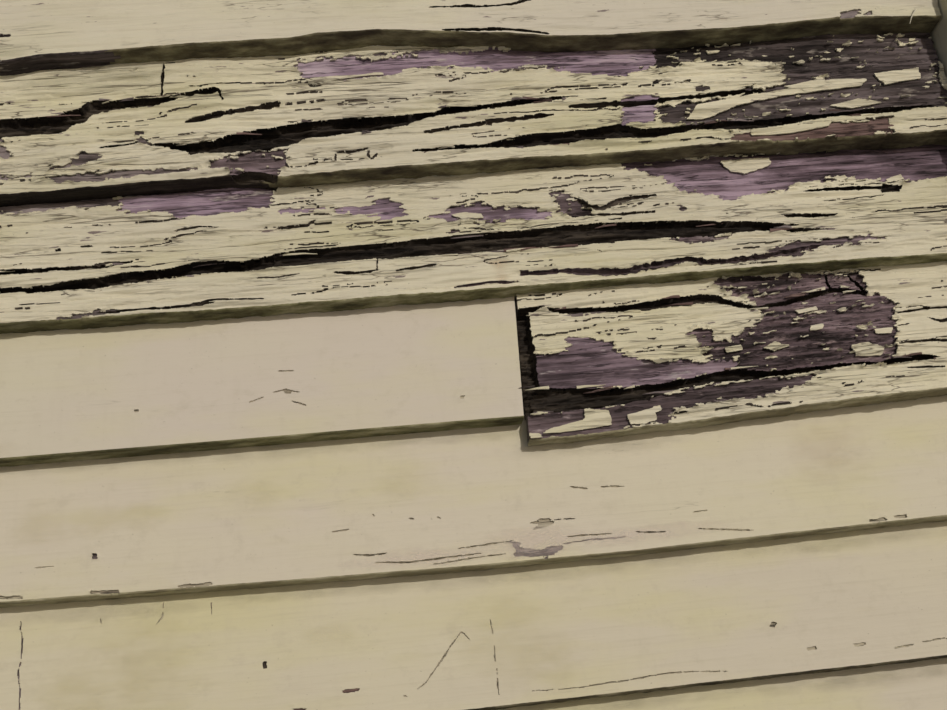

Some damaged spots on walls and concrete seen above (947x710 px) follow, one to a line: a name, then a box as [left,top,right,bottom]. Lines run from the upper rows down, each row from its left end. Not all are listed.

crack [430,0,548,34]
peeling [295,32,947,141]
peeling [47,152,198,183]
peeling [0,188,409,221]
peeling [210,149,290,176]
crack [0,58,947,353]
peeling [429,144,947,234]
peeling [670,234,732,244]
peeling [767,234,885,259]
peeling [528,271,899,439]
crack [16,621,24,710]
crack [490,620,500,695]